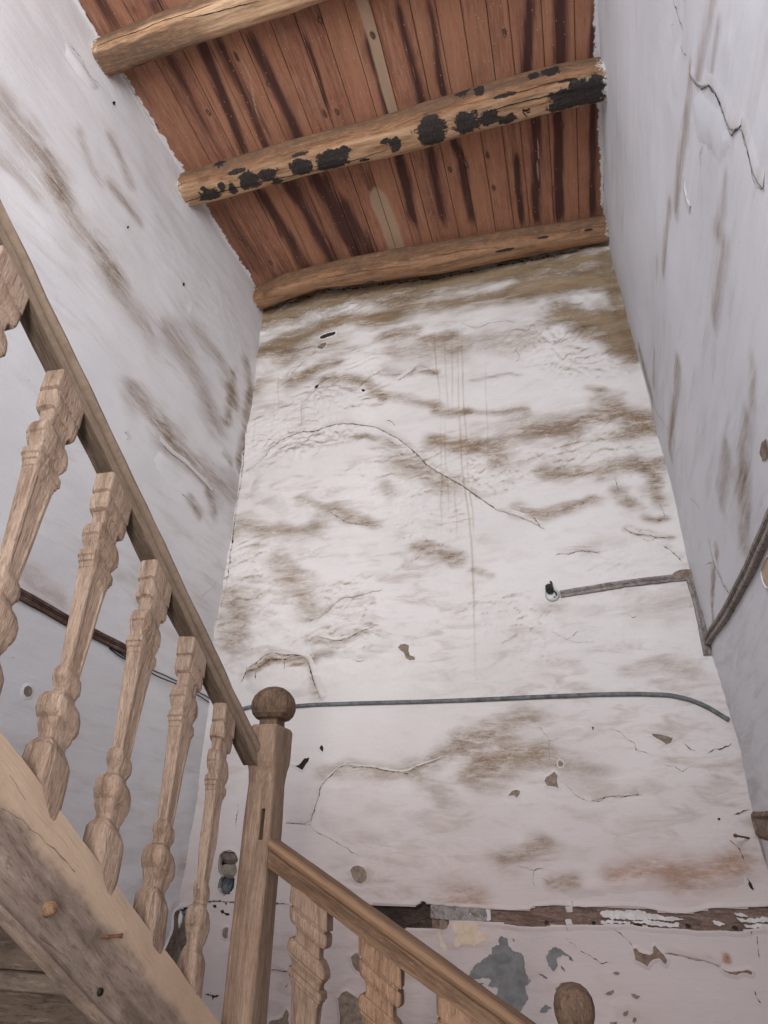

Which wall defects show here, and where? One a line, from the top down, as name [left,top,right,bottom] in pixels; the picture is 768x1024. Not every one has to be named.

crack [672,0,765,192]
damp [256,247,640,361]
damp [286,361,386,400]
damp [428,416,588,463]
damp [604,403,656,438]
crack [205,416,601,607]
flaking render [396,642,418,663]
crack [286,750,444,856]
damp [469,746,548,780]
flaking render [367,879,768,1012]